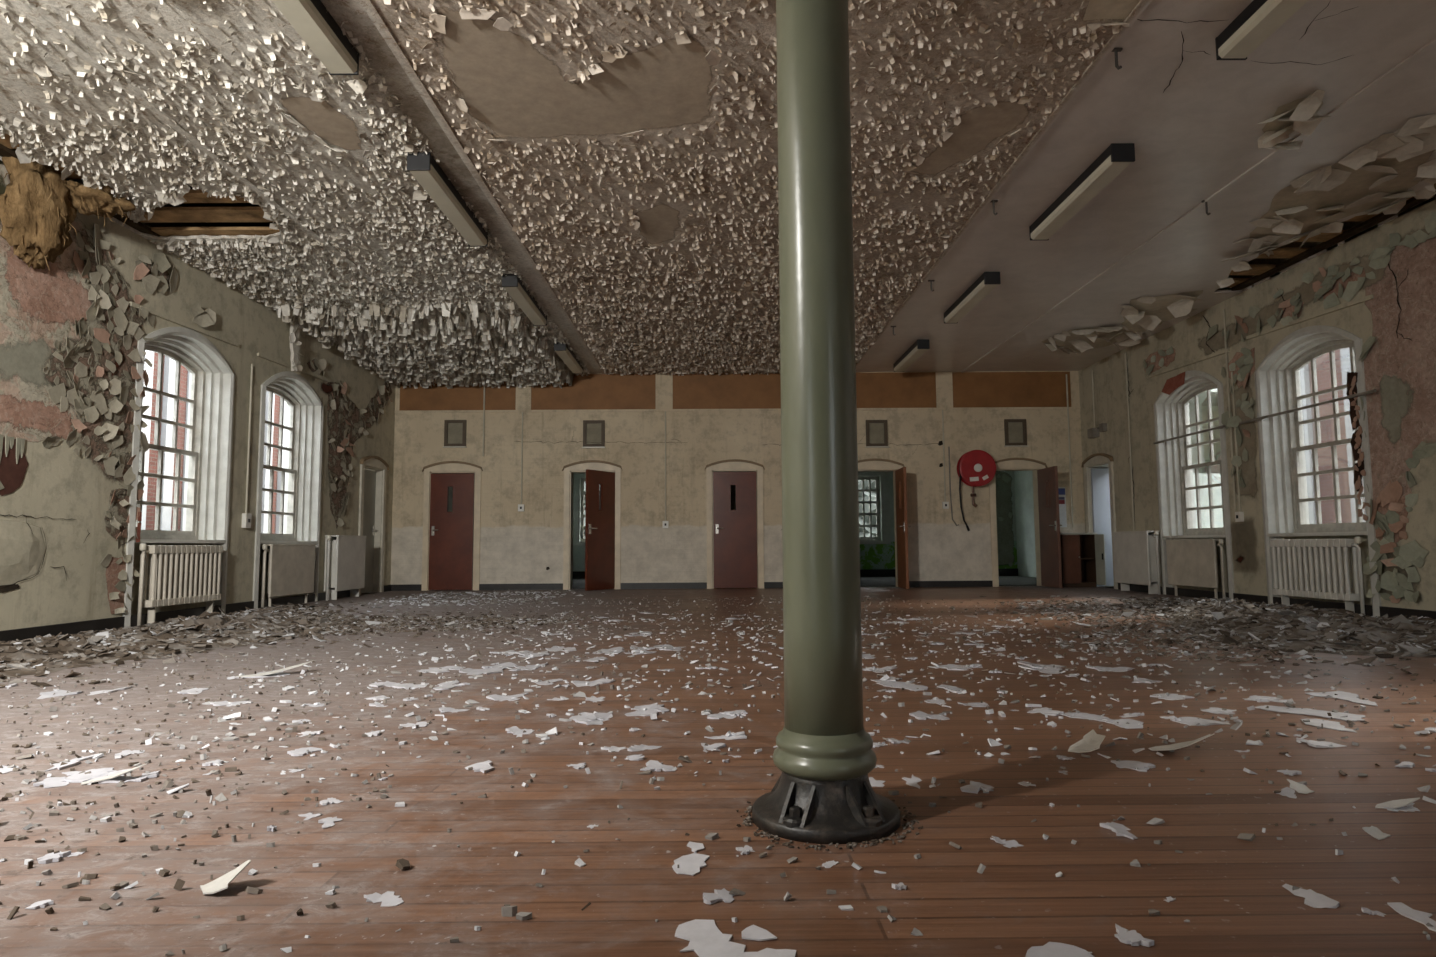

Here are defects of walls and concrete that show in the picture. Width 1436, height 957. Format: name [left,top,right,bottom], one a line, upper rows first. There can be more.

peeling [848,0,1140,364]
peeling [1257,89,1331,150]
peeling [1222,114,1436,262]
peeling [1042,290,1204,395]
flaking render [1199,228,1436,604]
crack [0,515,90,589]